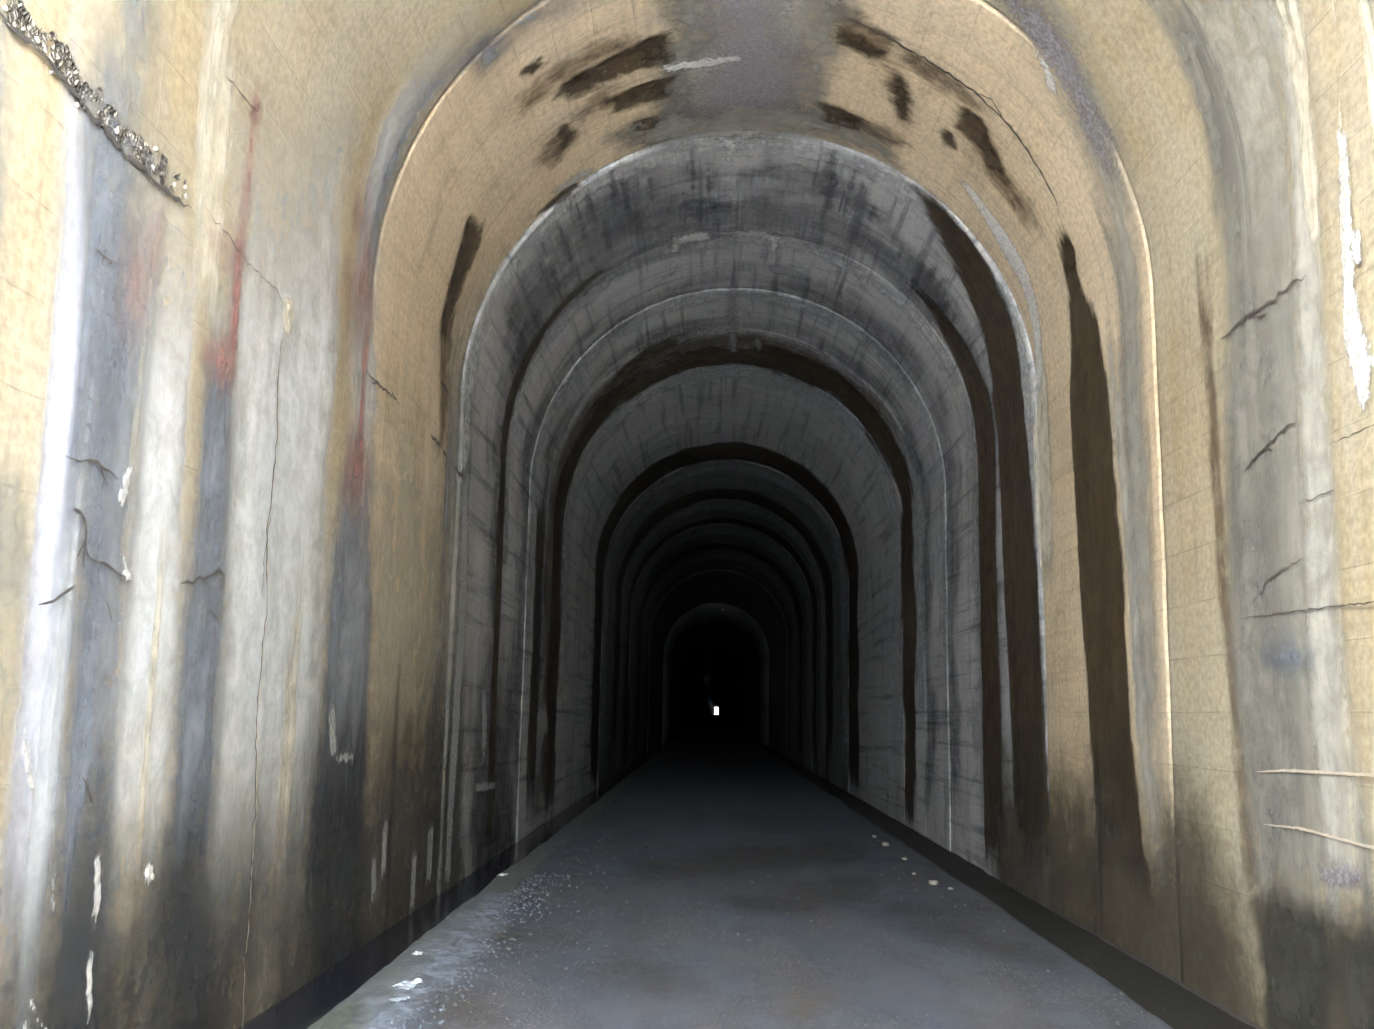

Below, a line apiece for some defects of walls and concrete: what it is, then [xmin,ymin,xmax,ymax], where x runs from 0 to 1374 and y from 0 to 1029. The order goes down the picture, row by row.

spalling [0,0,192,208]
rust [216,238,245,379]
crack [1219,275,1306,342]
crack [38,508,133,621]
crack [66,456,119,488]
crack [205,207,288,1026]
water stain [0,0,945,1029]
water stain [655,0,1374,1029]
crack [1239,559,1374,619]
crack [82,777,92,801]